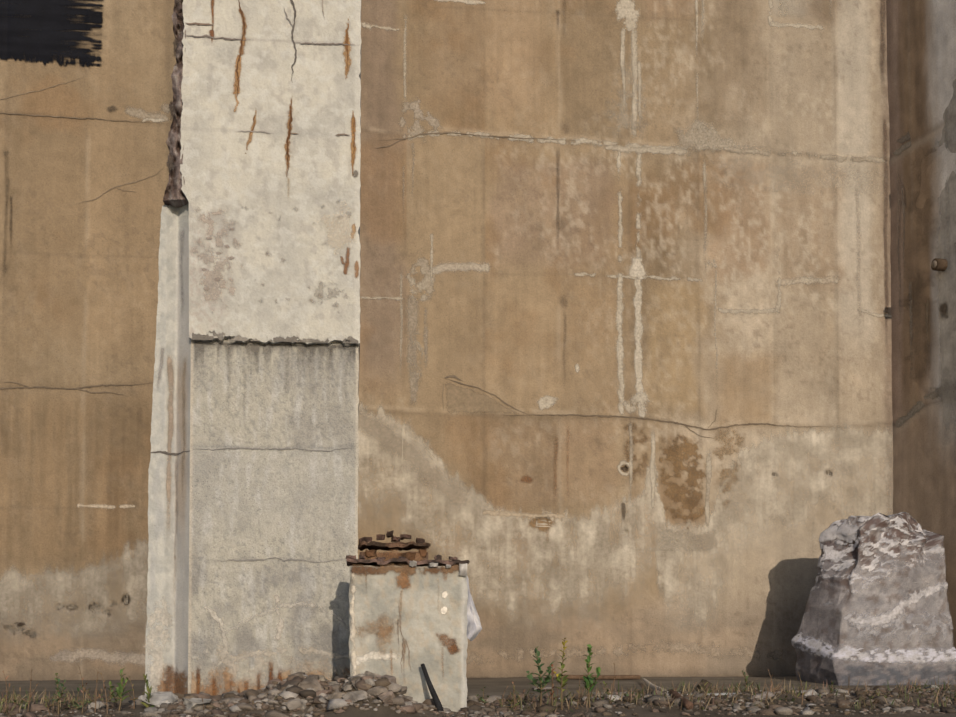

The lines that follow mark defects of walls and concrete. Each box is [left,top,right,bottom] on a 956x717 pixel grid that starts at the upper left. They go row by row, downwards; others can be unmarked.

spalling [163,0,188,208]
crack [185,0,268,133]
corrosion [284,101,293,175]
crack [284,0,354,80]
corrosion [343,19,351,78]
damp [362,0,912,339]
damp [195,342,355,358]
damp [358,79,956,623]
crack [442,375,833,439]
corrosion [351,550,459,592]
damp [0,542,171,691]
corrosion [157,666,290,696]